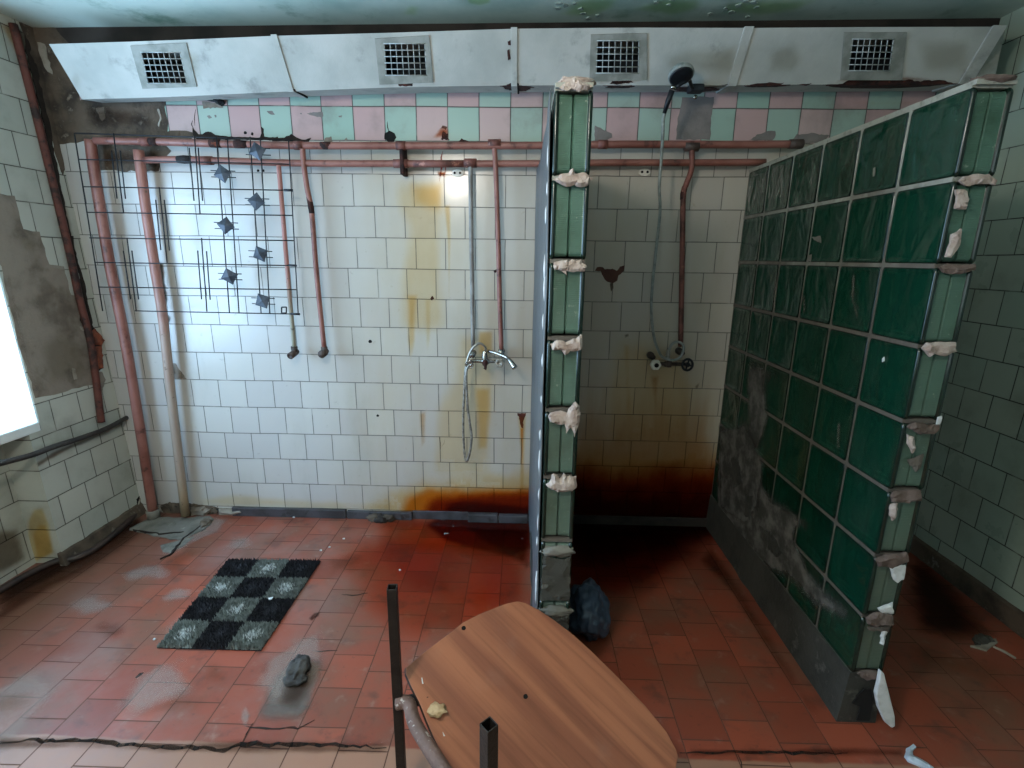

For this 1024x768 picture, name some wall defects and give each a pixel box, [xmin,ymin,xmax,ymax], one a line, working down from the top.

flaking render [19,22,311,175]
peeling [676,96,714,140]
corrosion [826,79,958,89]
flaking render [0,194,93,398]
corrosion [430,496,529,515]
corrosion [574,473,714,518]
crack [0,723,387,753]